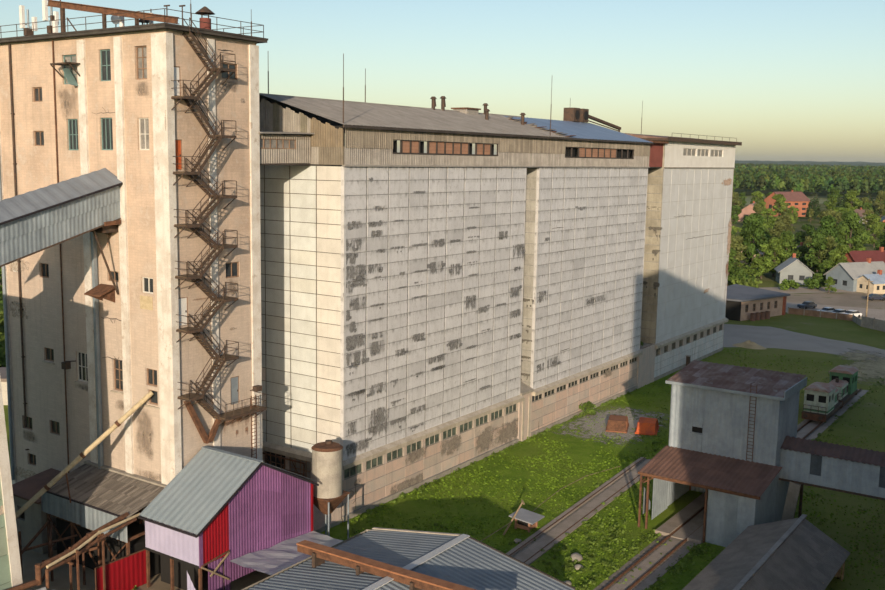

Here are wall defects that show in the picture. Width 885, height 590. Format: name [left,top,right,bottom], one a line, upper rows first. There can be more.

leakage [477,419,518,451]